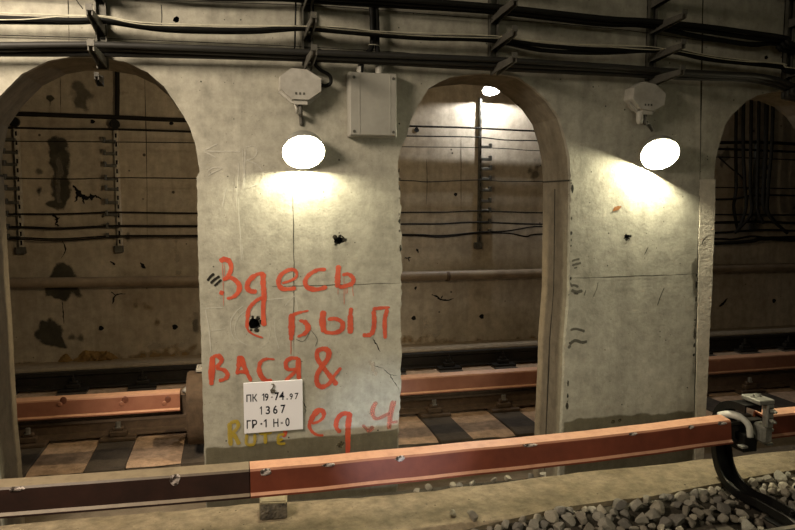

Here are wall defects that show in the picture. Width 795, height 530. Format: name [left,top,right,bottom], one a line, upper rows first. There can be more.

leakage [73,81,92,110]
leakage [46,137,71,210]
crack [73,185,101,204]
leakage [50,263,76,277]
leakage [45,287,81,301]
leakage [34,318,83,348]